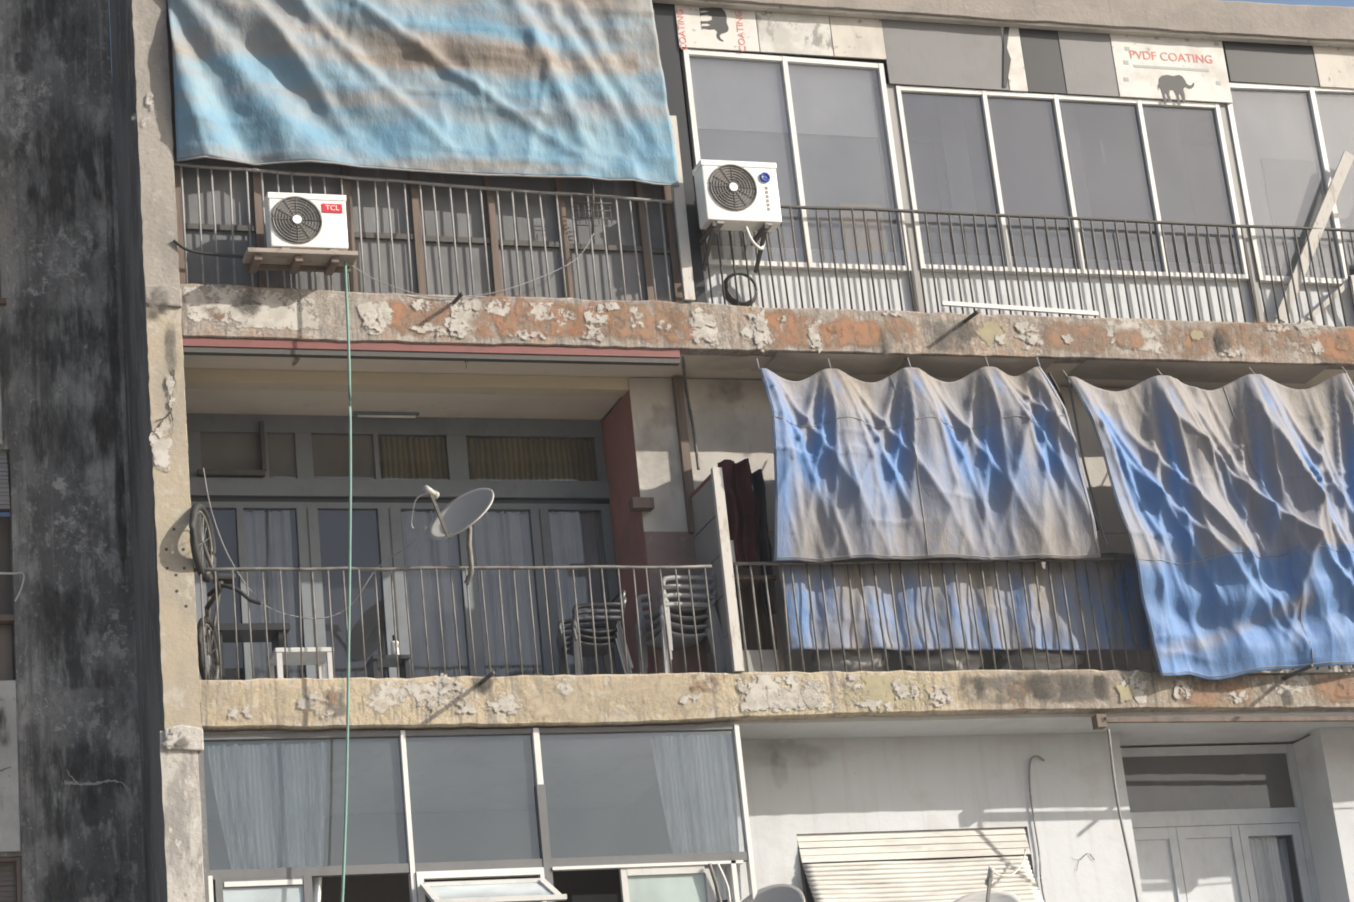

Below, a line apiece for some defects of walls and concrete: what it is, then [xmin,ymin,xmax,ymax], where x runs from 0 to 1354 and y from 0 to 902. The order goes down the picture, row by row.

damp [0,0,126,564]
peeling [182,284,322,330]
peeling [357,295,720,346]
peeling [994,318,1354,362]
peeling [166,330,177,408]
peeling [149,428,172,472]
damp [29,586,125,838]
peeling [367,673,702,719]
damp [969,675,1108,702]
peeling [1116,670,1148,704]
spalling [1261,675,1309,705]